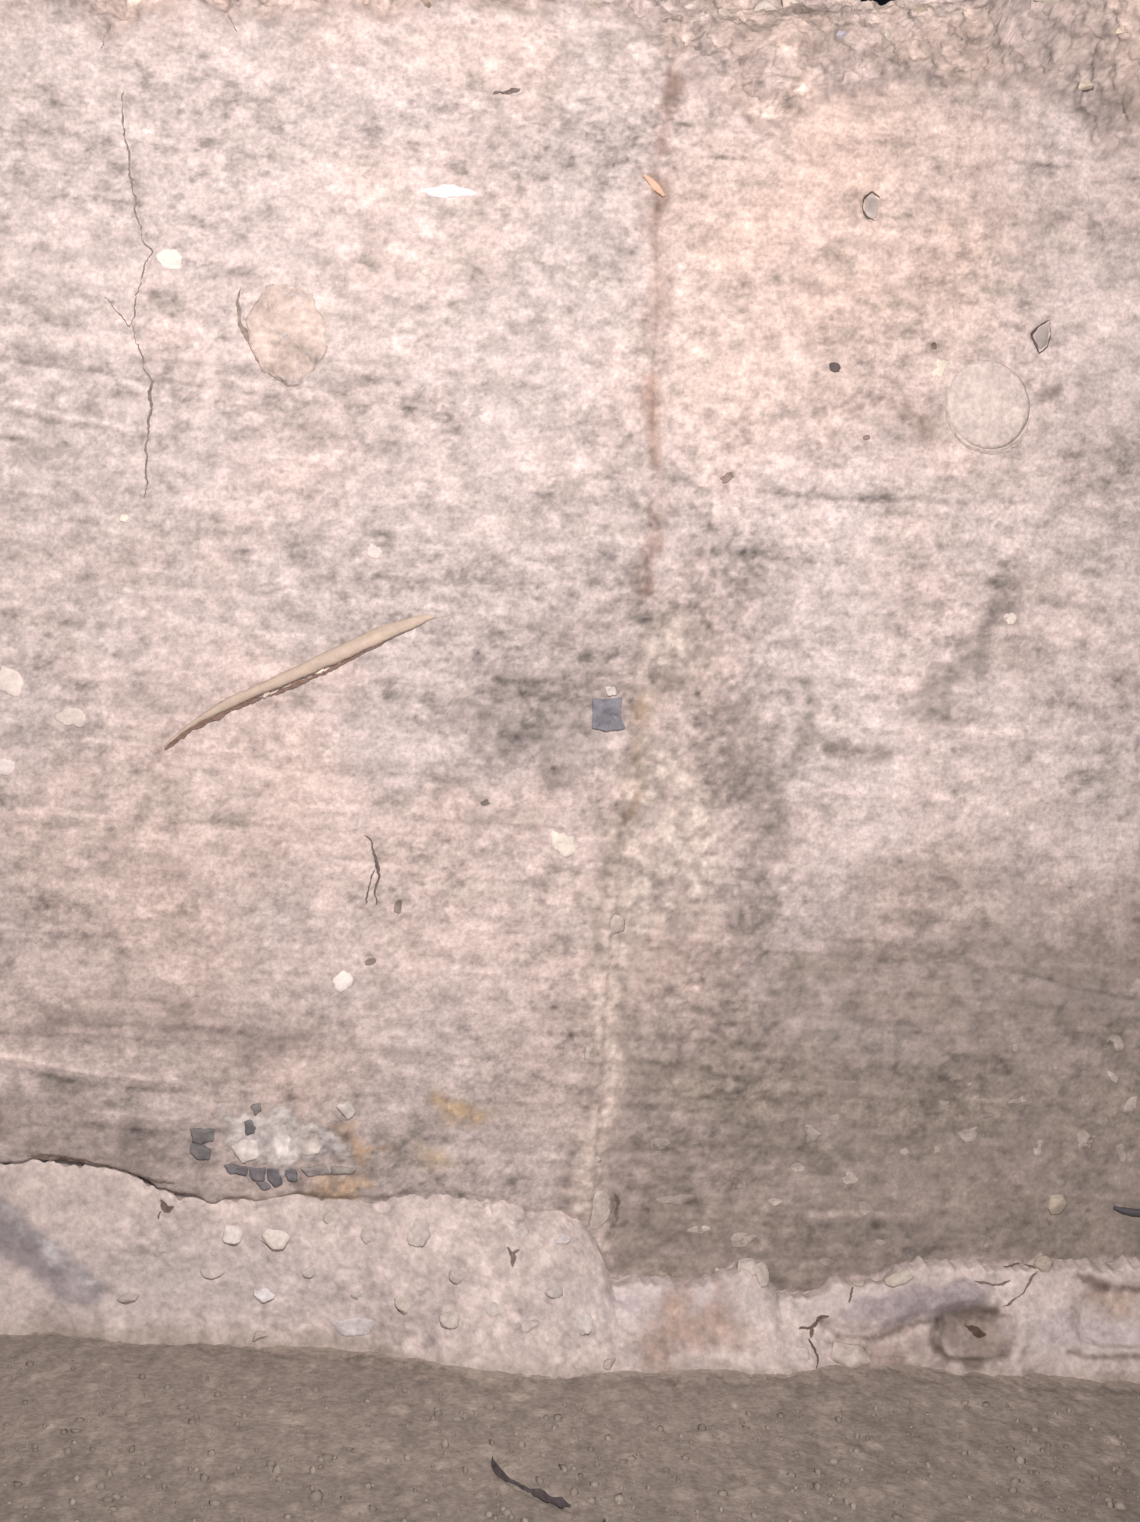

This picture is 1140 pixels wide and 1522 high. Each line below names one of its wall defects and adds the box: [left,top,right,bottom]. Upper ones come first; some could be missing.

crack [105,92,154,496]
peeling [1105,1034,1124,1051]
leakage [40,1240,63,1263]
spalling [0,1096,1140,1393]
crack [976,1262,1038,1306]
crack [799,1287,853,1369]
crack [867,1312,942,1339]